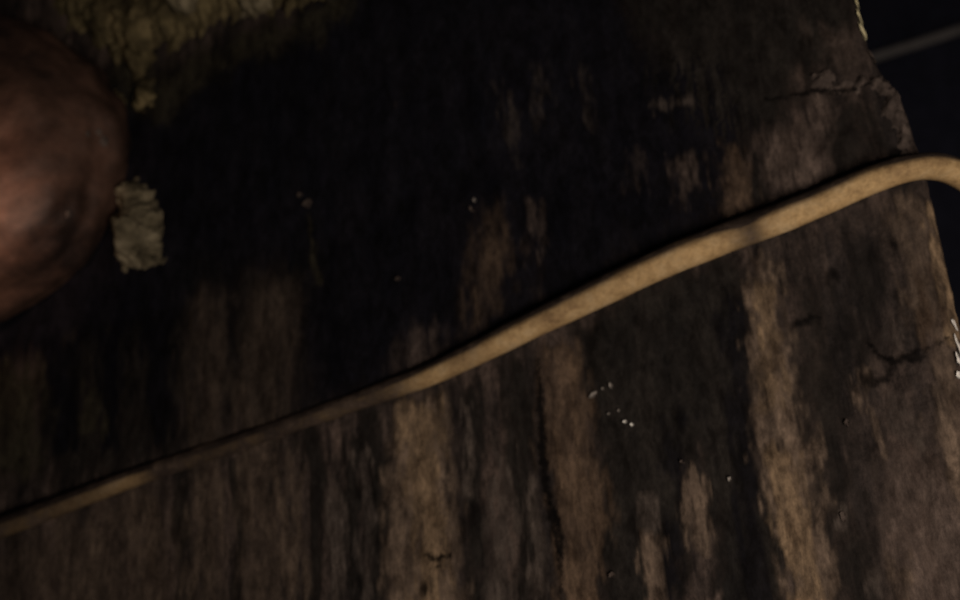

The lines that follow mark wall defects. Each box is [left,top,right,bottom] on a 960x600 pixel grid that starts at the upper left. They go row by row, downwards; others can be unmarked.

crack [765,83,872,101]
crack [871,342,942,387]